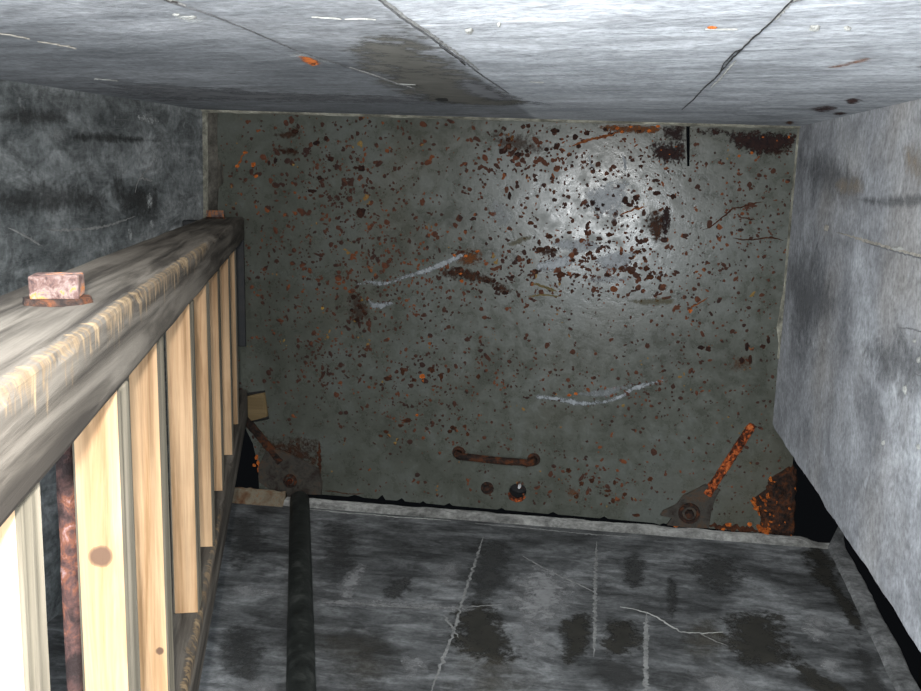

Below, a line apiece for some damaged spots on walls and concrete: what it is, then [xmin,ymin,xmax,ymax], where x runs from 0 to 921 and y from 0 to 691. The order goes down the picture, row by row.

crack [684,0,802,108]
corrosion [812,98,862,115]
corrosion [495,123,560,157]
corrosion [572,125,686,168]
corrosion [697,121,797,157]
corrosion [586,185,676,242]
corrosion [442,250,515,295]
corrosion [526,234,560,297]
corrosion [556,251,598,278]
corrosion [604,250,661,280]
corrosion [739,335,770,364]
corrosion [253,437,322,473]